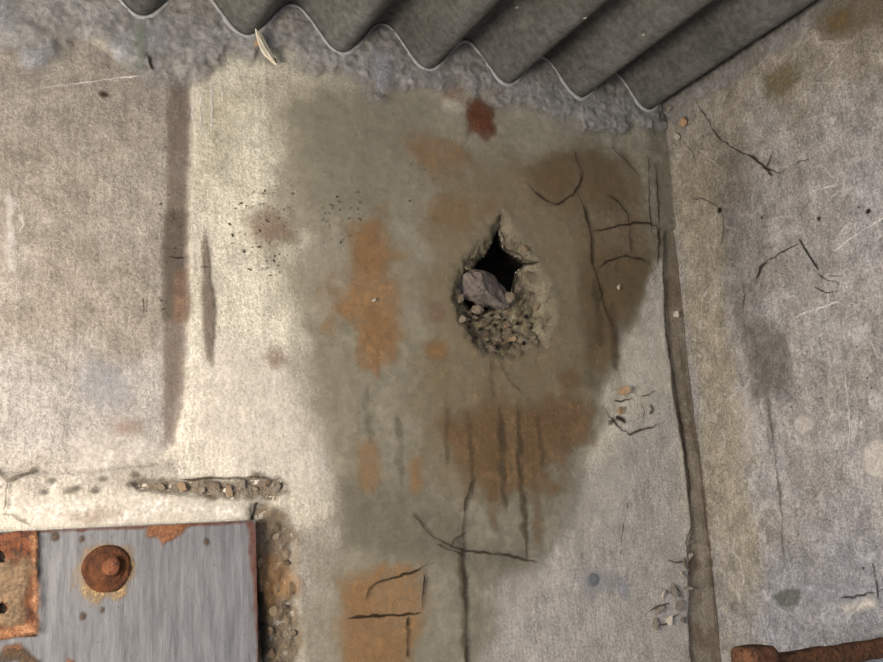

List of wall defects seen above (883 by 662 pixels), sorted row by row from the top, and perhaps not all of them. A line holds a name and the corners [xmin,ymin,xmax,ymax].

rust [467,100,495,138]
crack [694,99,806,176]
rust [335,223,399,373]
leakage [234,50,665,662]
spalling [450,211,555,358]
crack [530,151,690,501]
rust [445,397,591,501]
spalling [127,472,301,662]
rust [343,566,422,662]
crack [414,483,536,662]